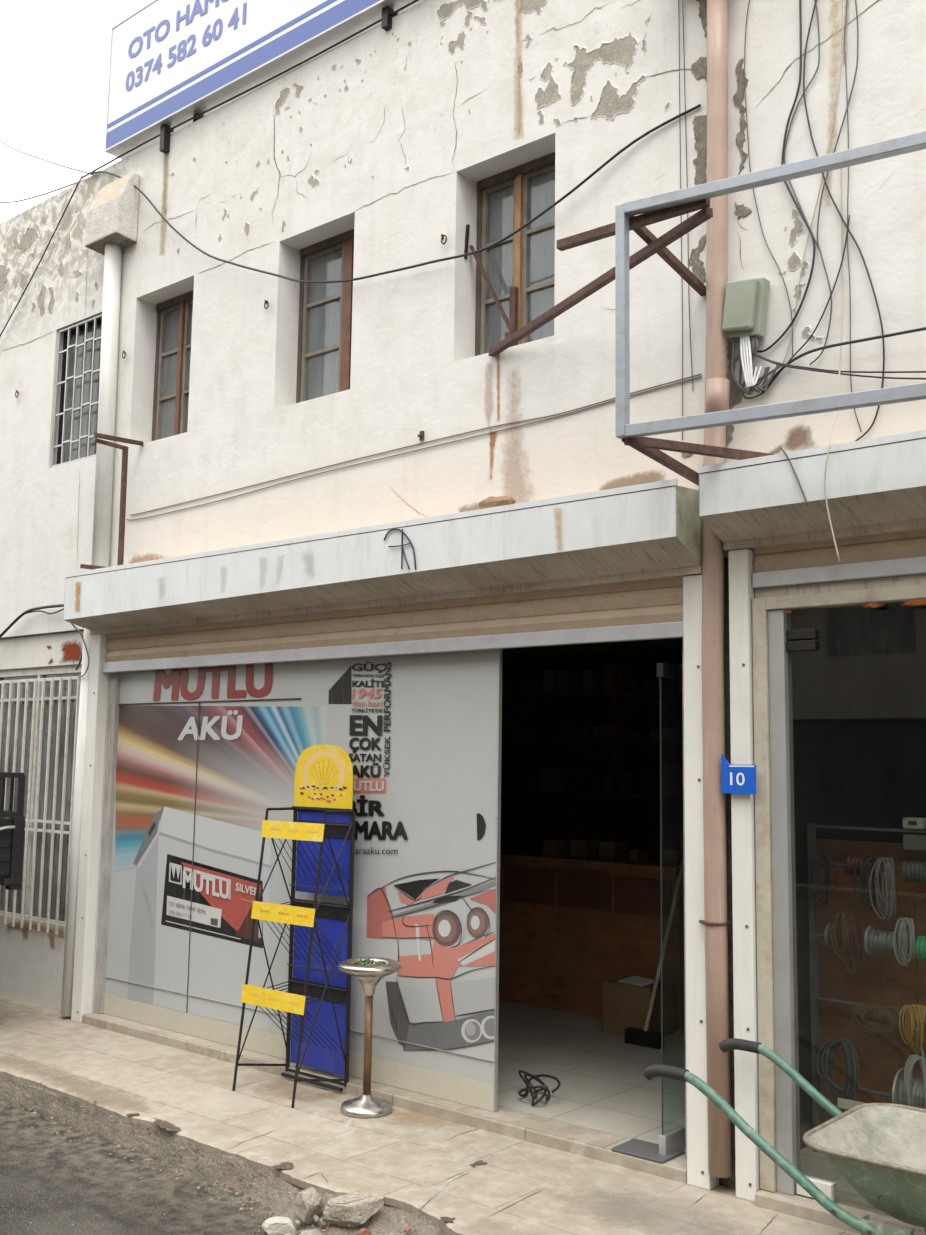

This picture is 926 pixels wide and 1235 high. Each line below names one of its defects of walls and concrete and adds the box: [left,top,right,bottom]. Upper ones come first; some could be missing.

peeling [436,0,502,63]
spalling [696,0,707,38]
peeling [517,14,652,127]
spalling [691,57,707,82]
crack [200,59,484,273]
spalling [692,115,707,185]
peeling [0,233,99,317]
spalling [689,234,706,283]
rust [489,354,499,479]
water stain [770,427,808,454]
water stain [601,472,661,490]
rust [46,641,82,664]